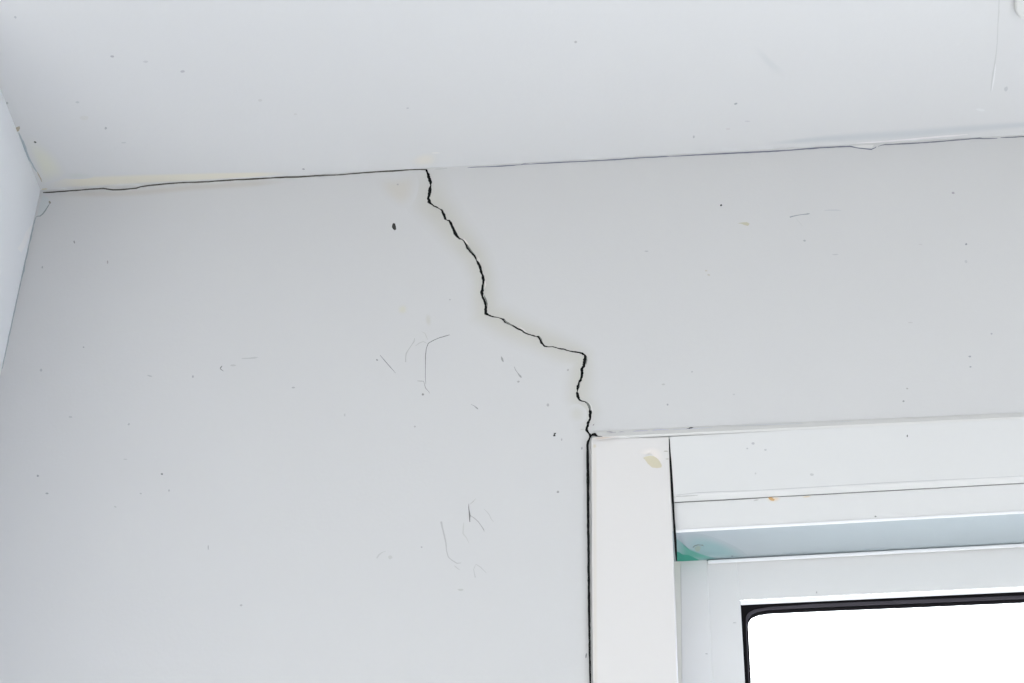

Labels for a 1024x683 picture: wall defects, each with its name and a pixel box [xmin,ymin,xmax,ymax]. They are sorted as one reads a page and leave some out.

crack [2,133,1024,438]